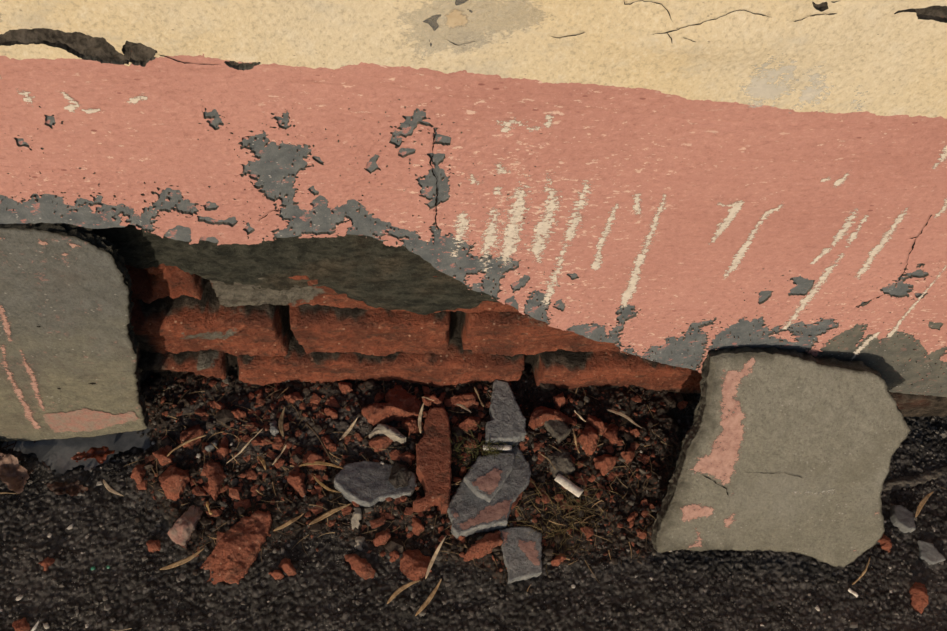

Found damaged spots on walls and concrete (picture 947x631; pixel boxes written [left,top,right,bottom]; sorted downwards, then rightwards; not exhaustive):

spalling [0,26,157,62]
crack [624,0,768,42]
spalling [915,5,947,18]
peeling [204,109,223,128]
peeling [275,111,291,127]
peeling [390,108,460,207]
crack [429,133,439,230]
water stain [450,172,591,308]
water stain [783,210,869,329]
crack [898,215,932,281]
spalling [0,130,947,485]